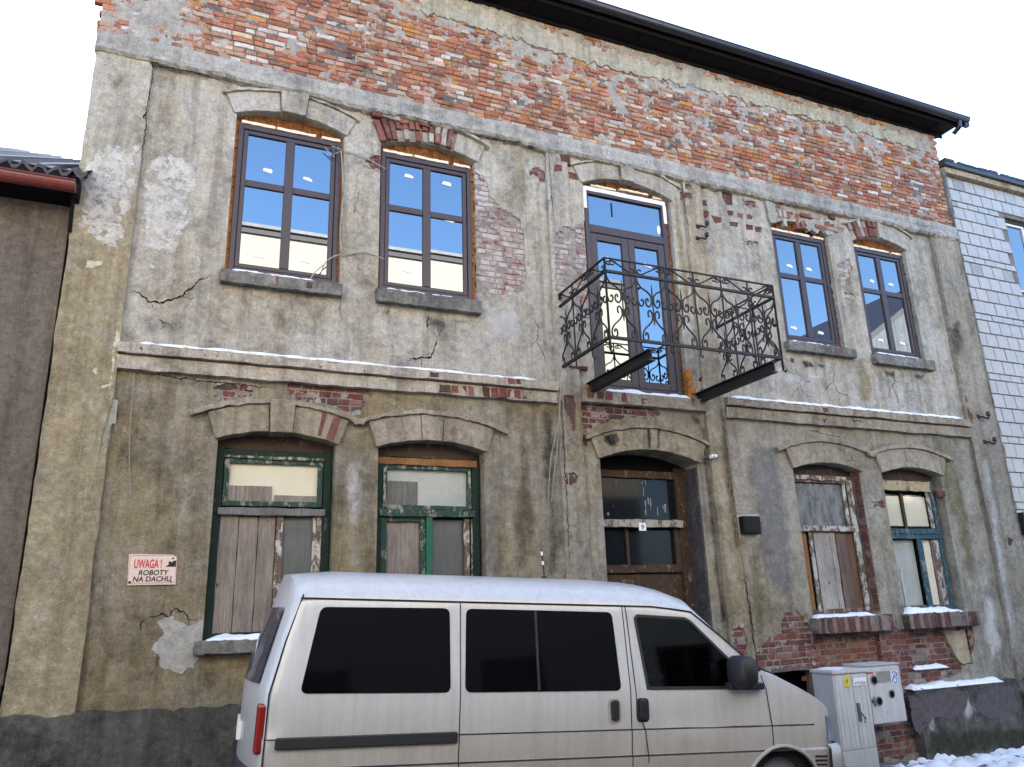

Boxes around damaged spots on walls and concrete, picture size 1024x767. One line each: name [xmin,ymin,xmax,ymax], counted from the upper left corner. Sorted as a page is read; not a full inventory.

crack [141,61,232,168]
flaking render [360,111,454,172]
peeling [78,144,196,269]
flaking render [473,172,527,298]
crack [130,275,210,331]
flaking render [550,221,589,324]
crack [409,316,444,366]
flaking render [212,383,253,402]
flaking render [287,383,370,441]
crack [139,606,197,631]
peeling [731,611,1019,763]